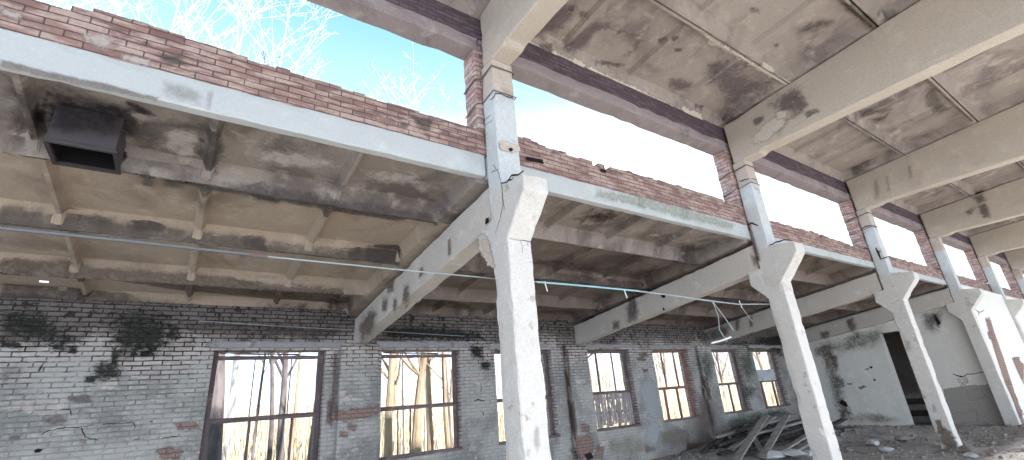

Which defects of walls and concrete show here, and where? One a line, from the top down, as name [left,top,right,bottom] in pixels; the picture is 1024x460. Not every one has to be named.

leakage [15,95,220,171]
leakage [710,61,763,125]
spalling [752,110,787,144]
leakage [775,91,818,117]
crack [493,165,531,250]
spalling [478,234,495,268]
leakage [0,258,351,384]
leakage [819,331,851,418]
crack [42,408,178,441]
flaking render [331,404,379,437]